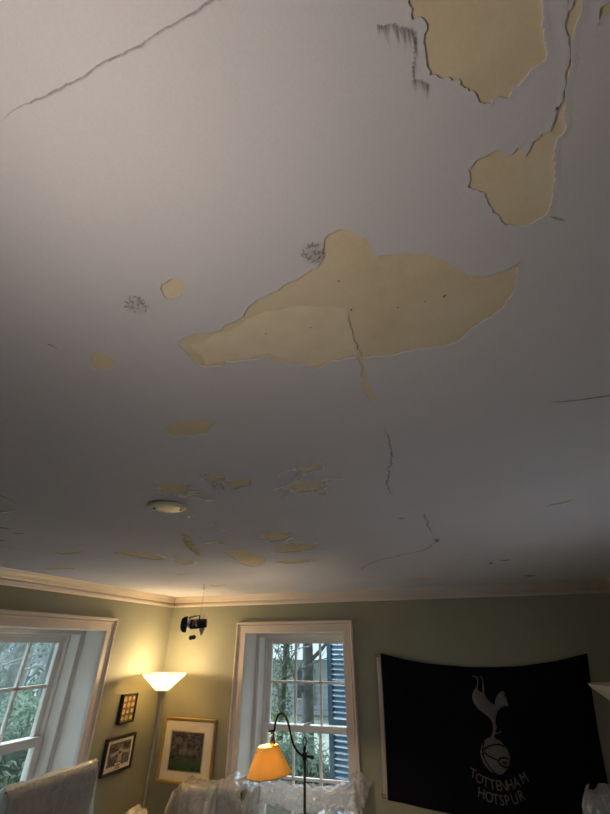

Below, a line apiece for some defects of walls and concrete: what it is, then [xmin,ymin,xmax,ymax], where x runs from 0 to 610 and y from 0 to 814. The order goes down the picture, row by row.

peeling [401,0,610,231]
peeling [174,225,523,404]
peeling [222,542,321,567]